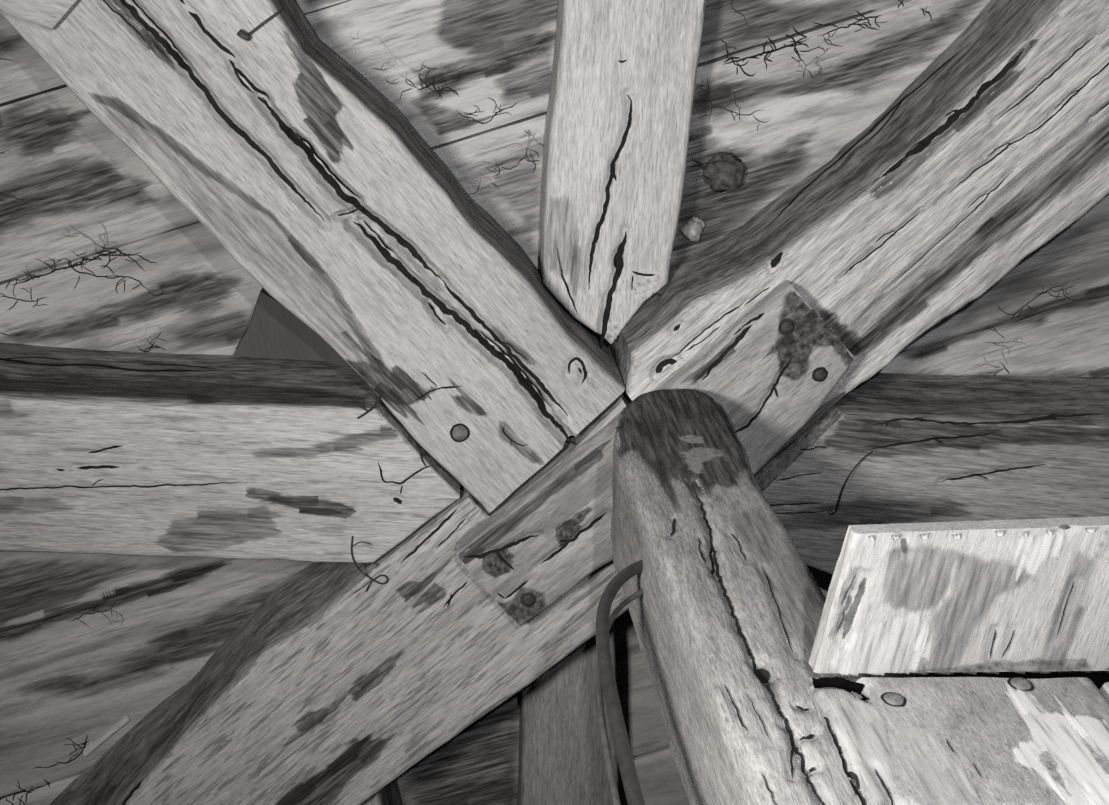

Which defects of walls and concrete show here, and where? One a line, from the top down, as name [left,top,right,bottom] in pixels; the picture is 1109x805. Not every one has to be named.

crack [103,0,576,445]
crack [556,95,661,349]
crack [768,41,971,226]
crack [840,38,1109,286]
damp [397,343,845,616]
crack [670,489,825,805]
crack [823,716,893,805]
peeling [1005,683,1109,805]